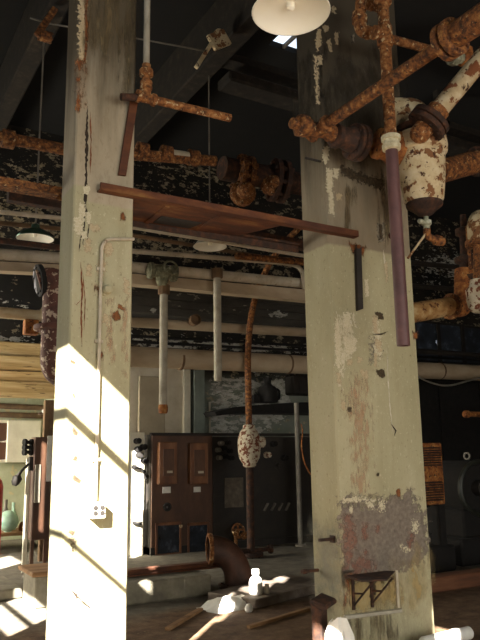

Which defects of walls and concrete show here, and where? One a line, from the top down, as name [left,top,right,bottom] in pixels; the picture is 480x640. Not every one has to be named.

spalling [75,0,89,112]
peeling [314,25,339,65]
peeling [322,145,385,217]
peeling [72,185,101,254]
corrosion [110,304,126,329]
peeling [333,311,385,391]
peeling [336,488,431,582]